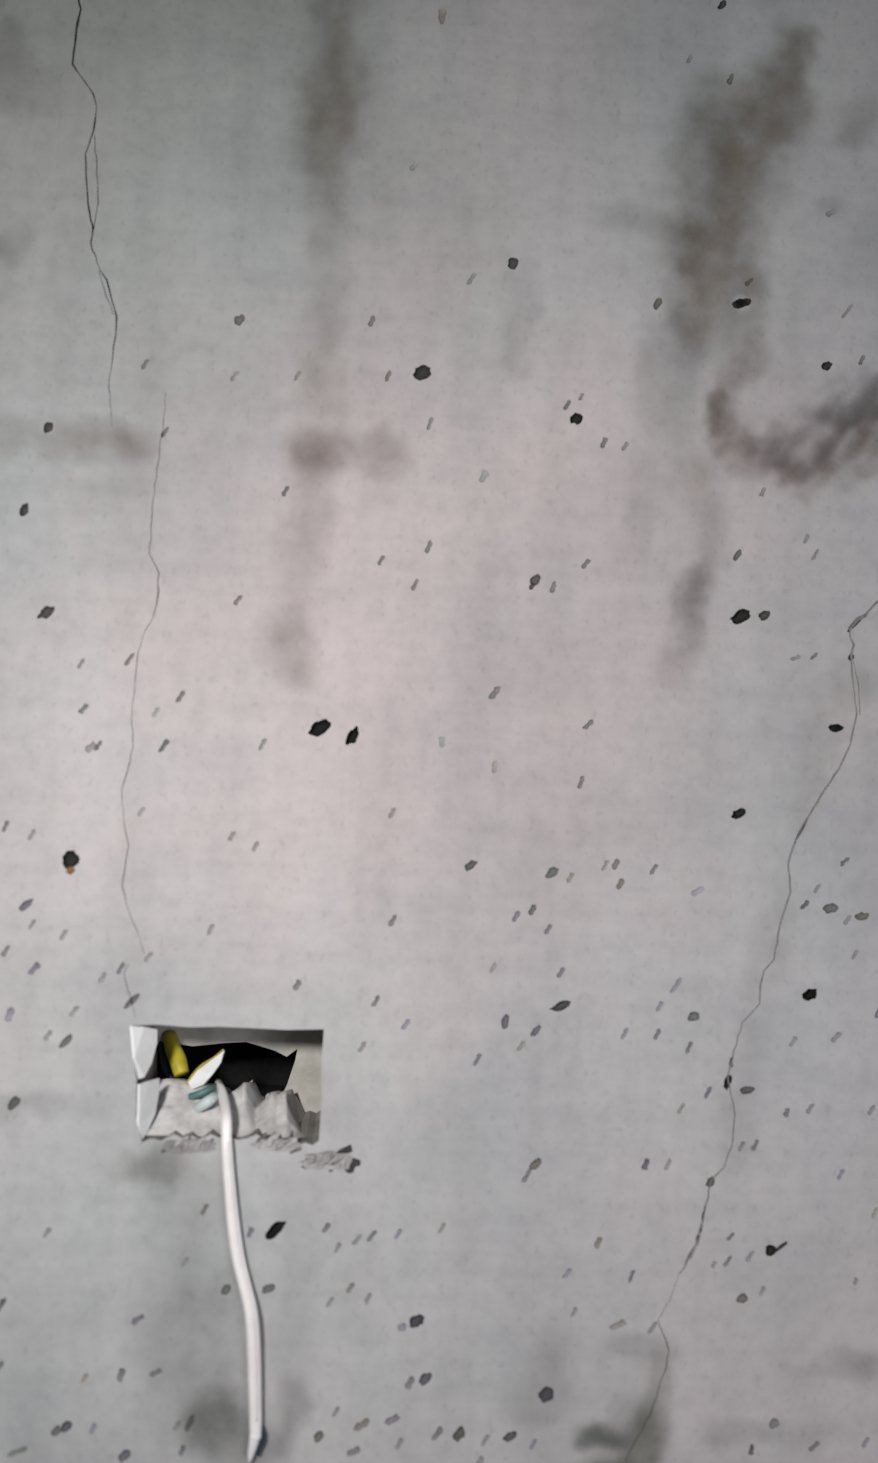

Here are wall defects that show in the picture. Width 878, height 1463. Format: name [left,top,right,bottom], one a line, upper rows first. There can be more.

crack [72,0,117,425]
crack [121,395,166,1015]
crack [626,600,878,1461]